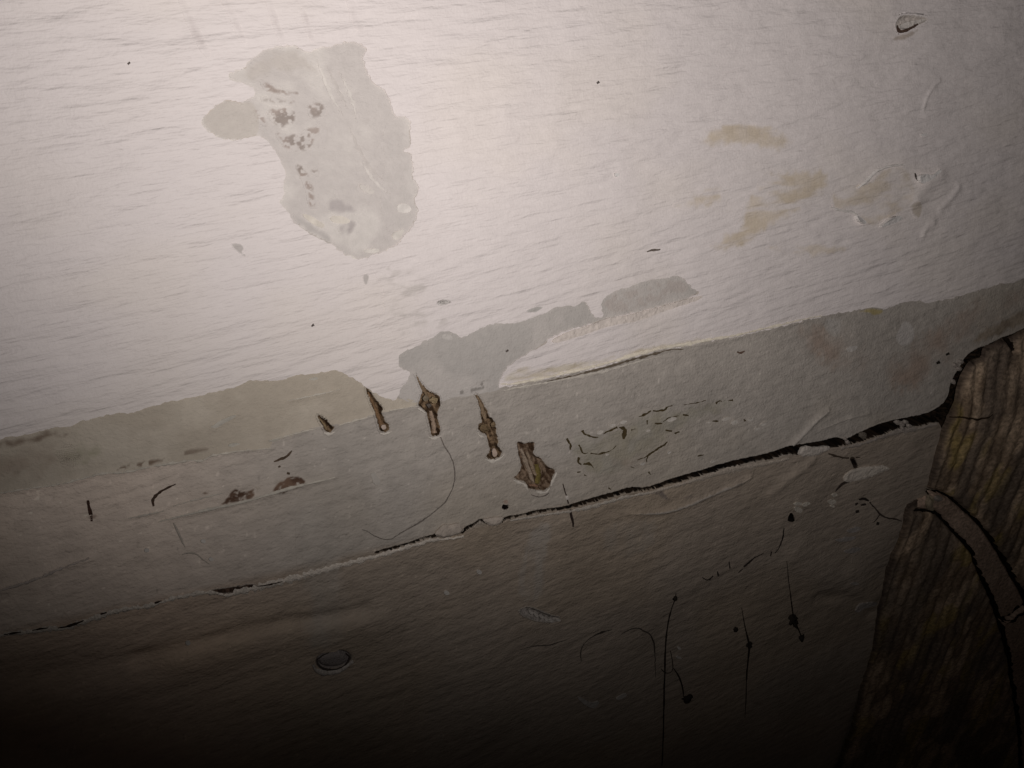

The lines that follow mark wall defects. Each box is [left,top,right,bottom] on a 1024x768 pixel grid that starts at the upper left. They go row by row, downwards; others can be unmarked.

spalling [890,13,929,42]
peeling [201,41,419,259]
rust [220,475,306,505]
peeling [0,276,702,494]
crack [0,327,1024,637]
peeling [566,397,768,490]